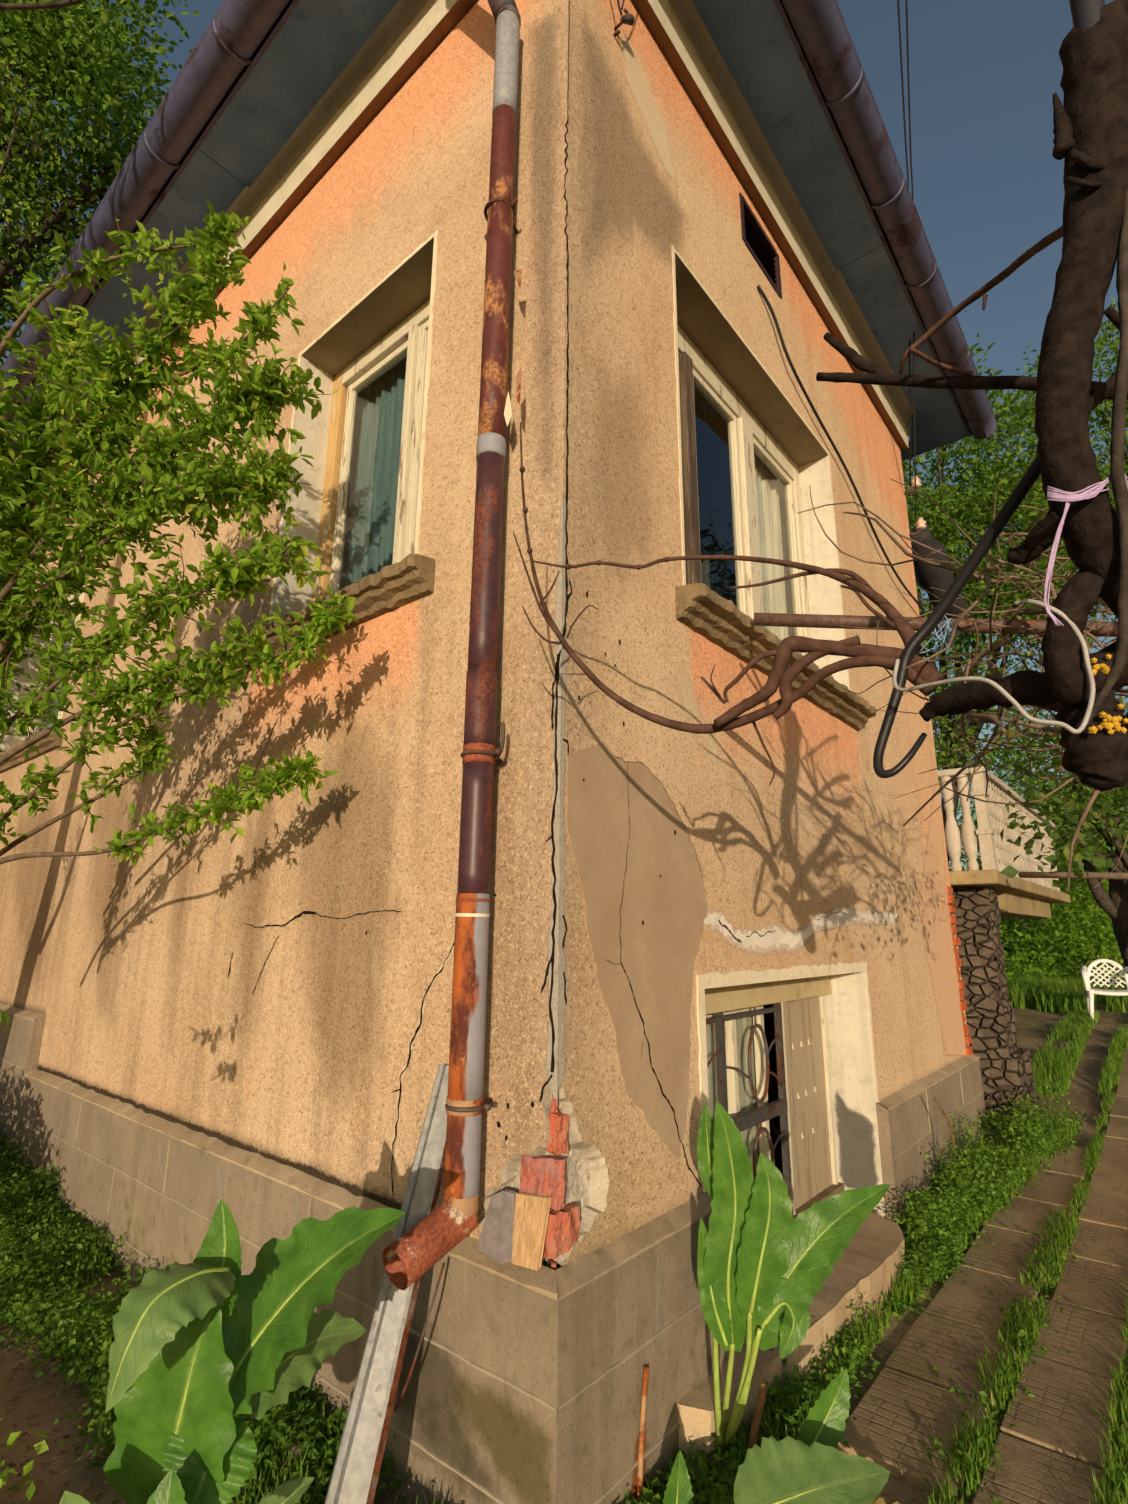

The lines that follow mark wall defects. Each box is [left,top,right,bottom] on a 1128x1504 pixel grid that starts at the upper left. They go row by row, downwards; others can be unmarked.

crack [539,0,572,1103]
crack [228,910,402,994]
spalling [480,495,609,1270]
crack [718,920,776,943]
crack [390,943,454,1196]
rust [430,1141,446,1213]
rust [366,1277,421,1504]